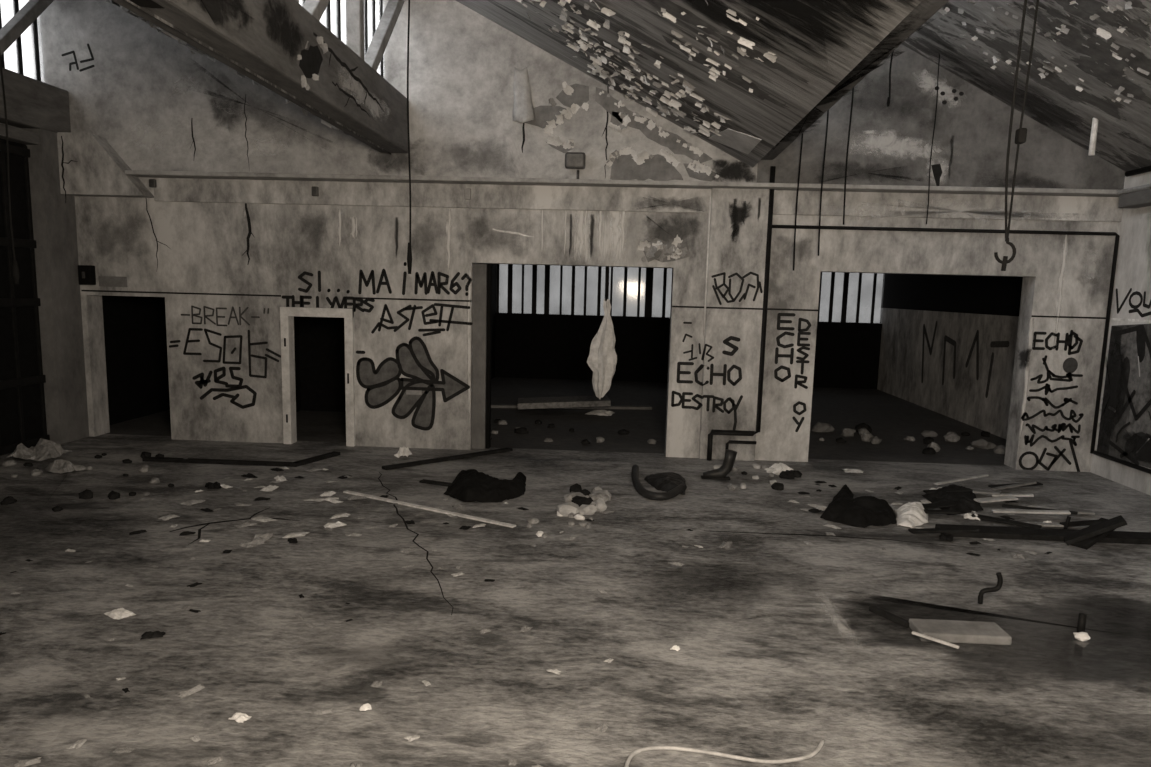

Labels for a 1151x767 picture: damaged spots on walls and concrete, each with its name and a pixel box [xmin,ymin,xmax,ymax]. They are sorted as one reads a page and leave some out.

peeling [105,0,273,92]
damp [197,0,302,56]
spalling [297,36,328,91]
peeling [516,0,809,181]
peeling [938,0,1151,108]
crack [242,94,250,162]
crack [244,203,255,265]